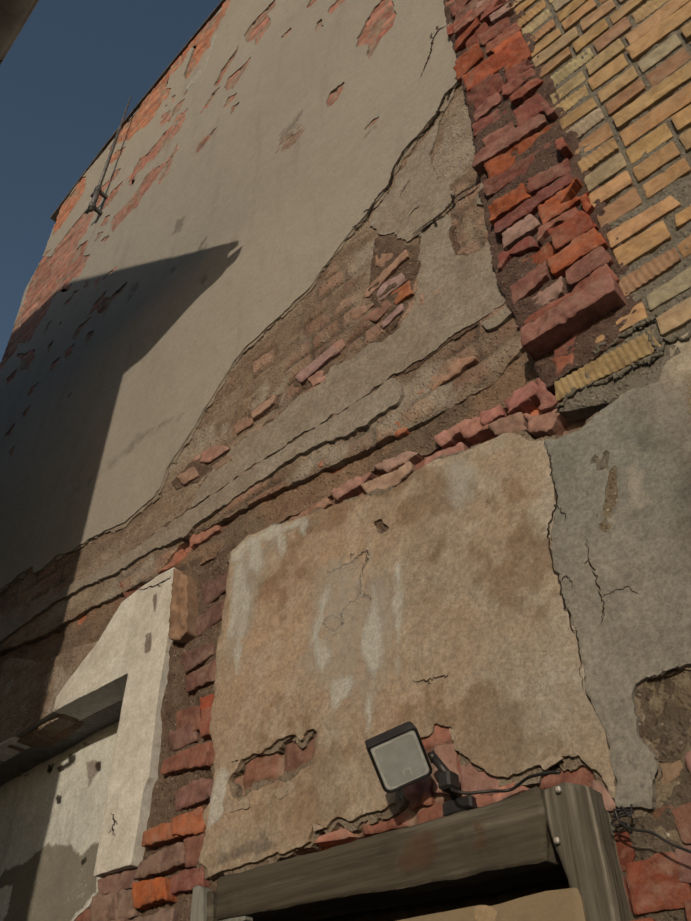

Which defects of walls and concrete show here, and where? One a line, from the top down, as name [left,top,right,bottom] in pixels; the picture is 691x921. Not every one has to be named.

crack [420,21,451,77]
spalling [0,0,642,594]
flaking render [0,581,145,752]
efflorescence [227,520,307,664]
crack [322,547,372,635]
efflorescence [361,594,383,674]
crack [544,441,639,685]
efflorescence [208,770,228,826]
flaking render [196,663,691,921]